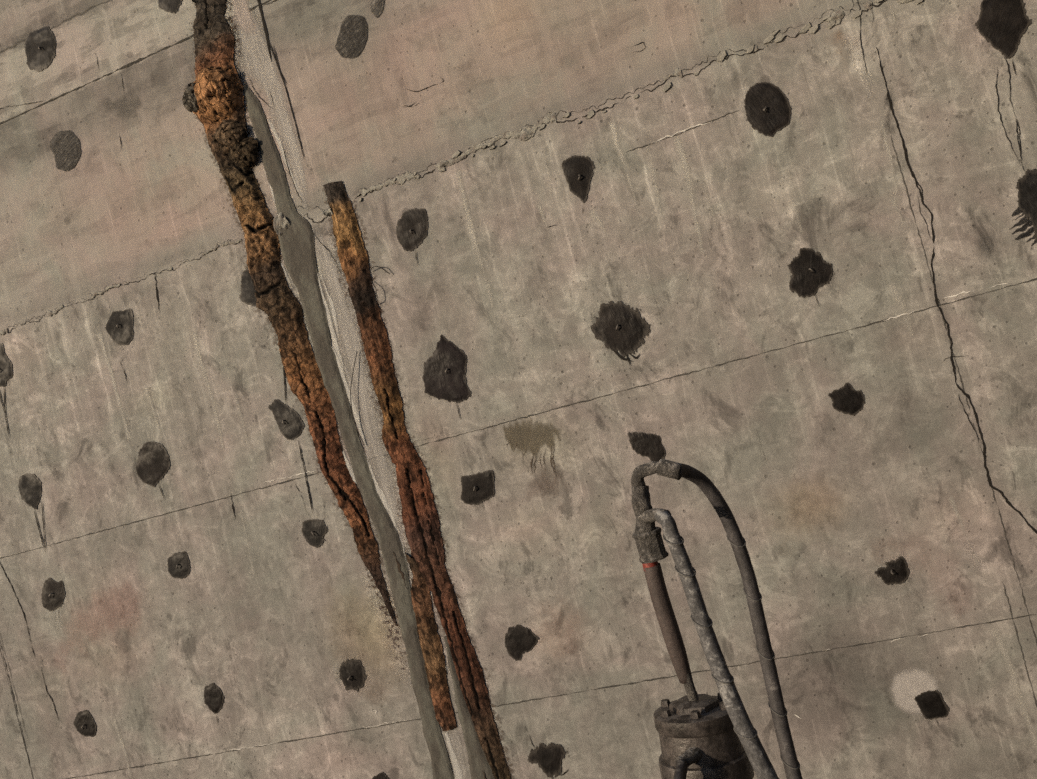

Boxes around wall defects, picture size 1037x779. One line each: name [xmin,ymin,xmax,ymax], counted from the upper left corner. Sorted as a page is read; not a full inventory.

crack [0,564,59,721]
rust [182,0,397,626]
rust [323,181,511,779]
crack [857,0,1037,534]